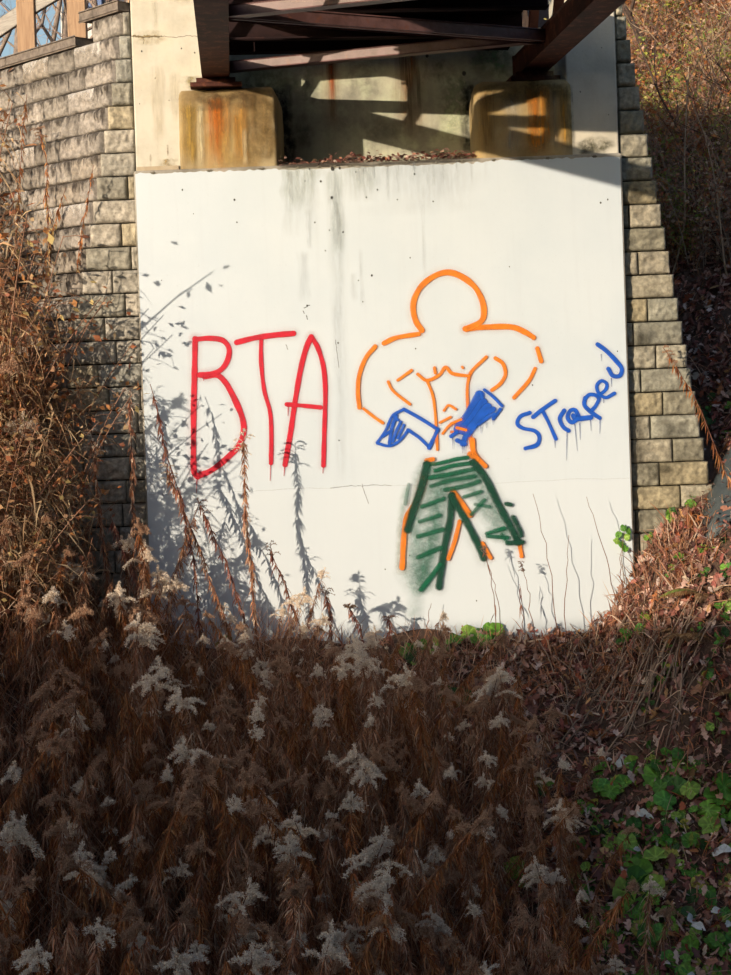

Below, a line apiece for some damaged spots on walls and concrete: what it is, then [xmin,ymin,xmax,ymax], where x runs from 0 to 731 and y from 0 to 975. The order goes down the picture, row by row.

crack [132,35,197,44]
rust [185,100,246,162]